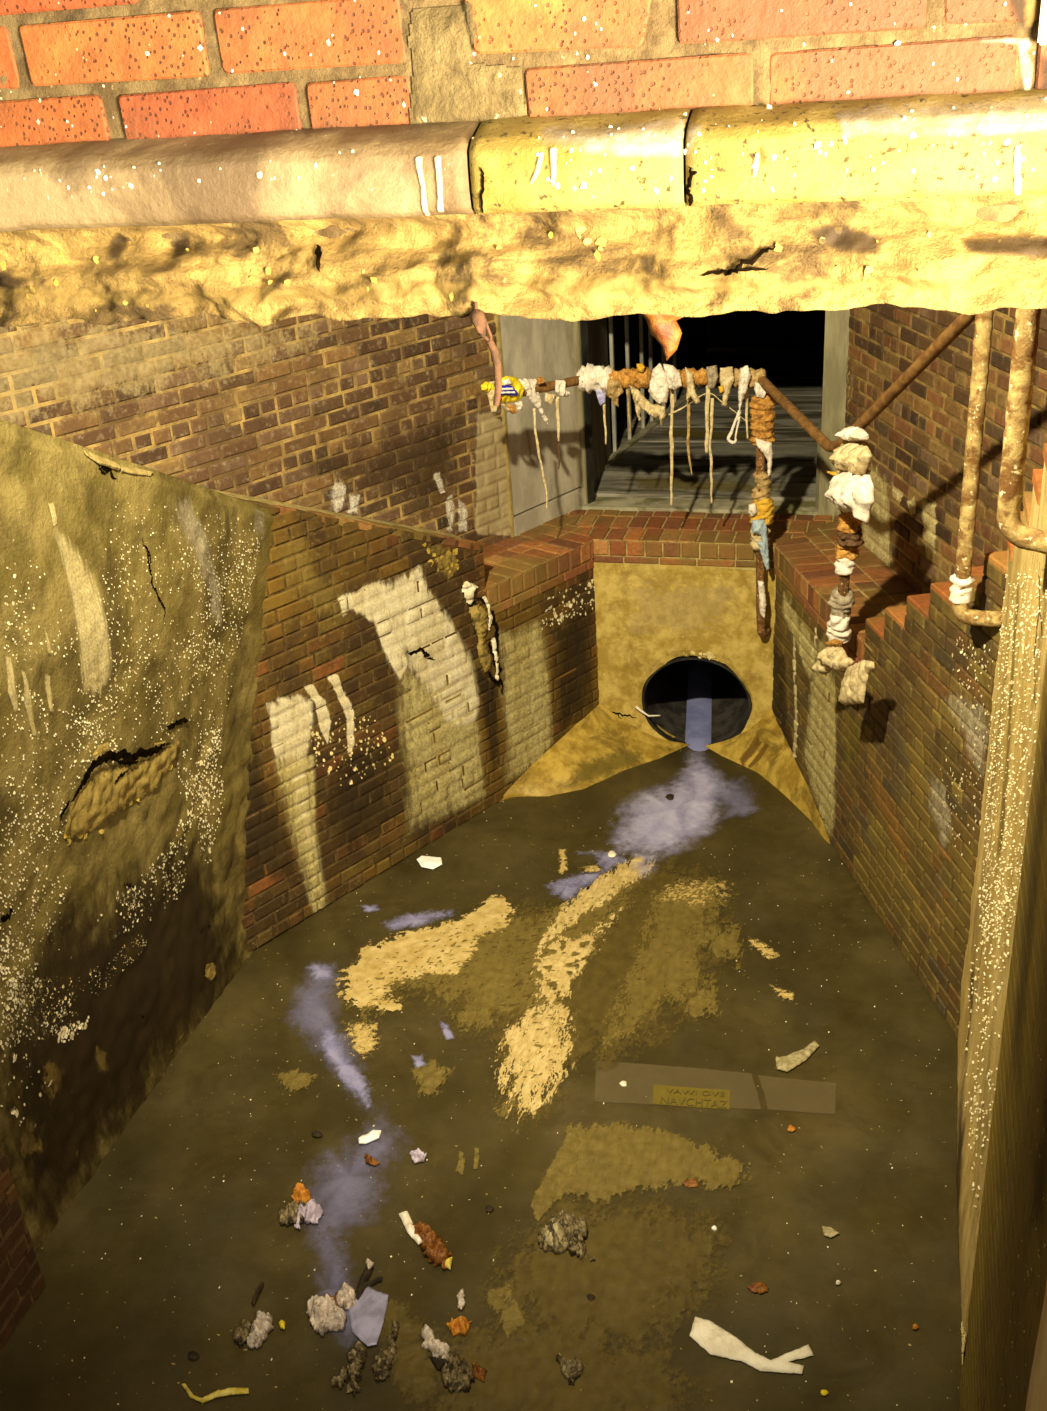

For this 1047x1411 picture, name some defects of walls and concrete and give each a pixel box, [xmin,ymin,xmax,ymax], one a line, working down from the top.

crack [702,246,776,276]
damp [6,656,53,735]
damp [49,503,110,694]
spalling [0,503,262,1126]
crack [142,538,166,620]
damp [244,674,387,912]
damp [338,569,591,821]
damp [997,589,1018,851]